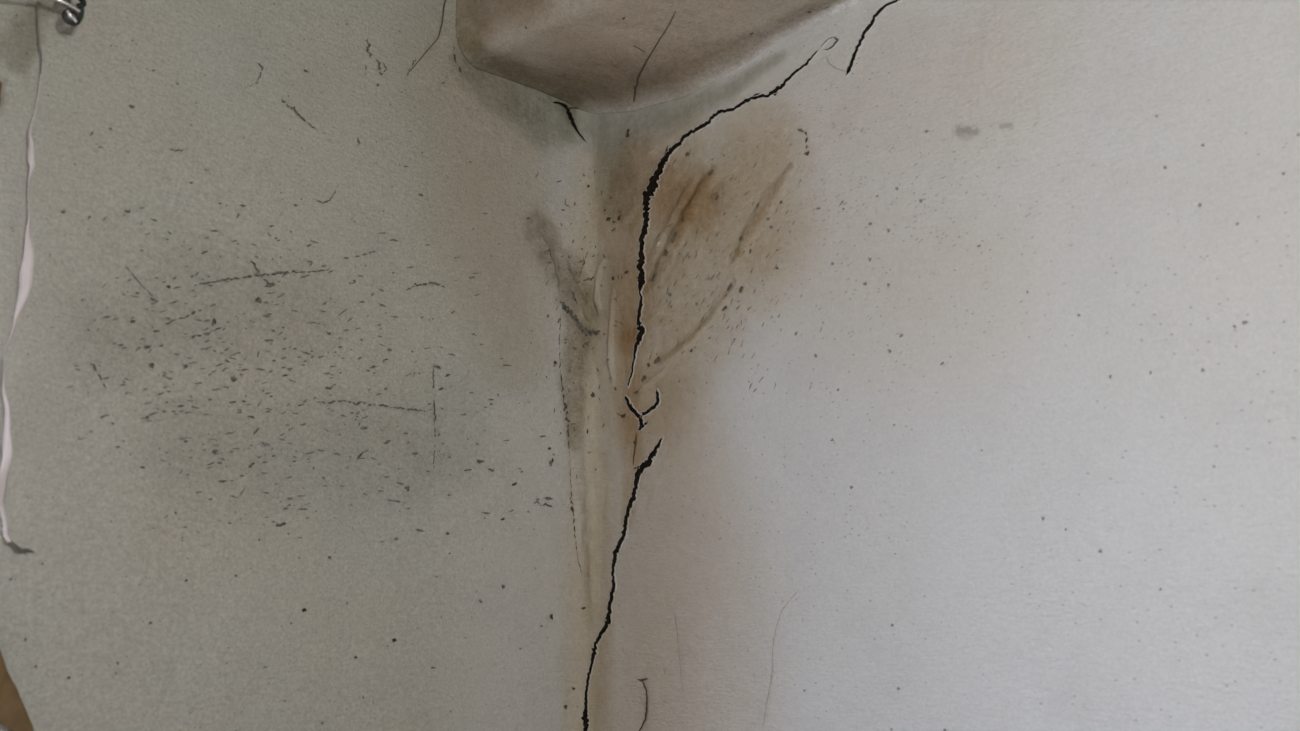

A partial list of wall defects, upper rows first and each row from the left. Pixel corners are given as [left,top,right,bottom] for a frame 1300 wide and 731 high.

crack [552,101,586,142]
crack [580,0,903,731]